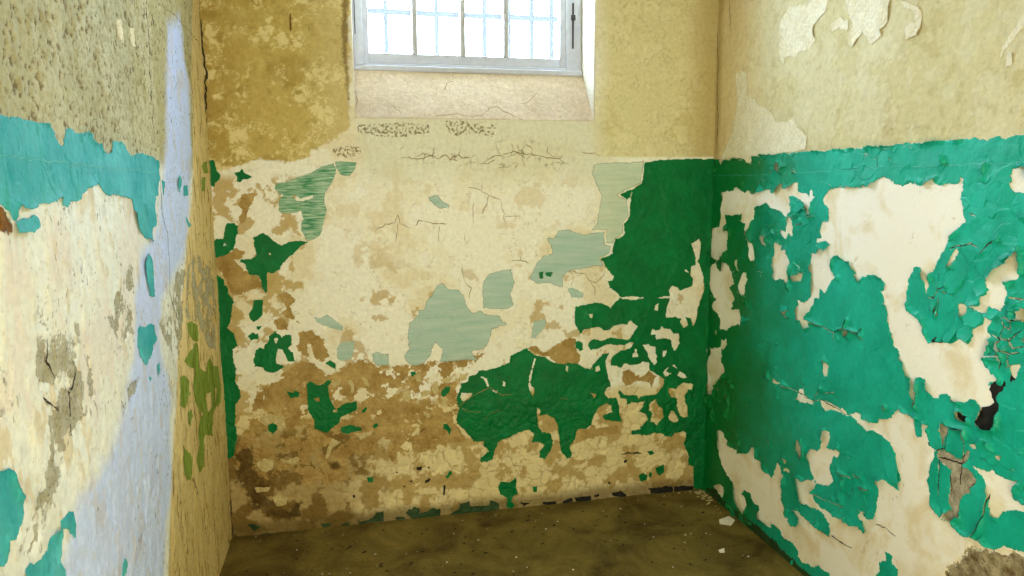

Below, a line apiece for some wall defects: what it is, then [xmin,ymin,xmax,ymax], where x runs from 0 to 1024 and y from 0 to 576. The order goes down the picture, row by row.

crack [146,4,209,150]
leakage [341,0,349,100]
peeling [778,0,922,65]
peeling [1000,14,1024,67]
peeling [0,115,165,241]
leakage [357,123,429,137]
leakage [446,120,495,137]
crack [377,81,599,244]
peeling [108,70,1024,576]
crack [43,341,76,432]
flaking render [0,324,94,576]
leakage [235,449,303,519]